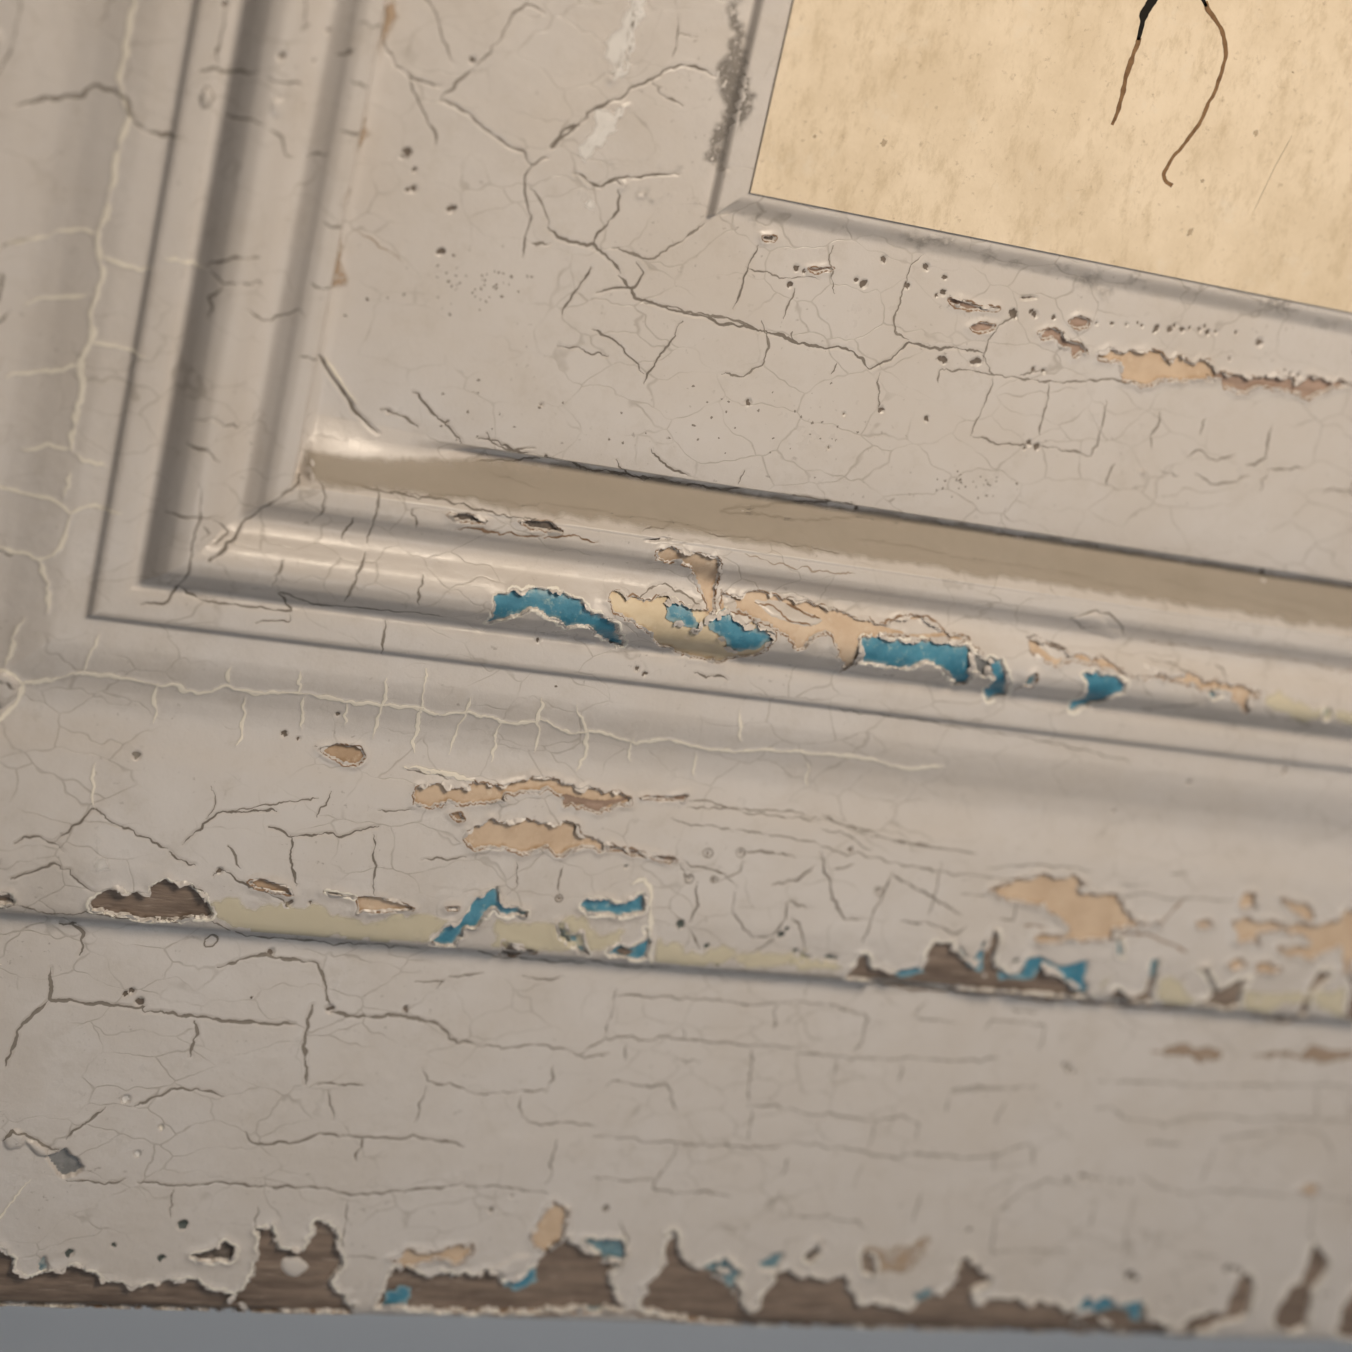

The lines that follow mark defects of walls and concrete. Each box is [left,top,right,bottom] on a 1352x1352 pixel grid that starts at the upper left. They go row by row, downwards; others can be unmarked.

crack [199,0,1303,491]
peeling [935,275,1352,401]
crack [0,0,1131,967]
crack [299,354,1325,584]
peeling [411,776,690,864]
peeling [85,877,217,925]
peeling [428,886,531,948]
peeling [555,877,655,965]
peeling [799,873,1352,1023]
peeling [0,1217,357,1315]
peeling [373,1201,1258,1338]
peeling [1271,1240,1332,1335]